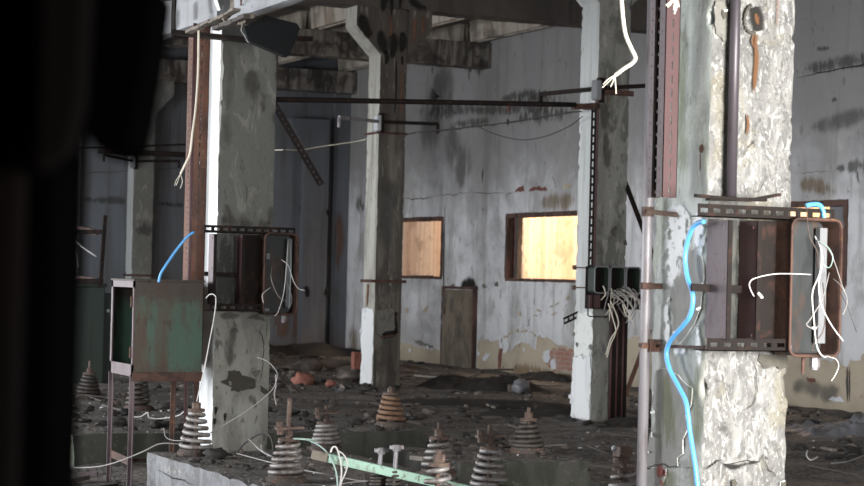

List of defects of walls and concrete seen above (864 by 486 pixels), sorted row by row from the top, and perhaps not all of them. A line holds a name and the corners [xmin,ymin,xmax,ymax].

corrosion [751,35,759,91]
crack [409,192,510,200]
peeling [666,249,705,344]
peeling [221,370,269,395]
peeling [476,311,593,421]
peeling [757,353,864,412]
crack [647,455,779,478]